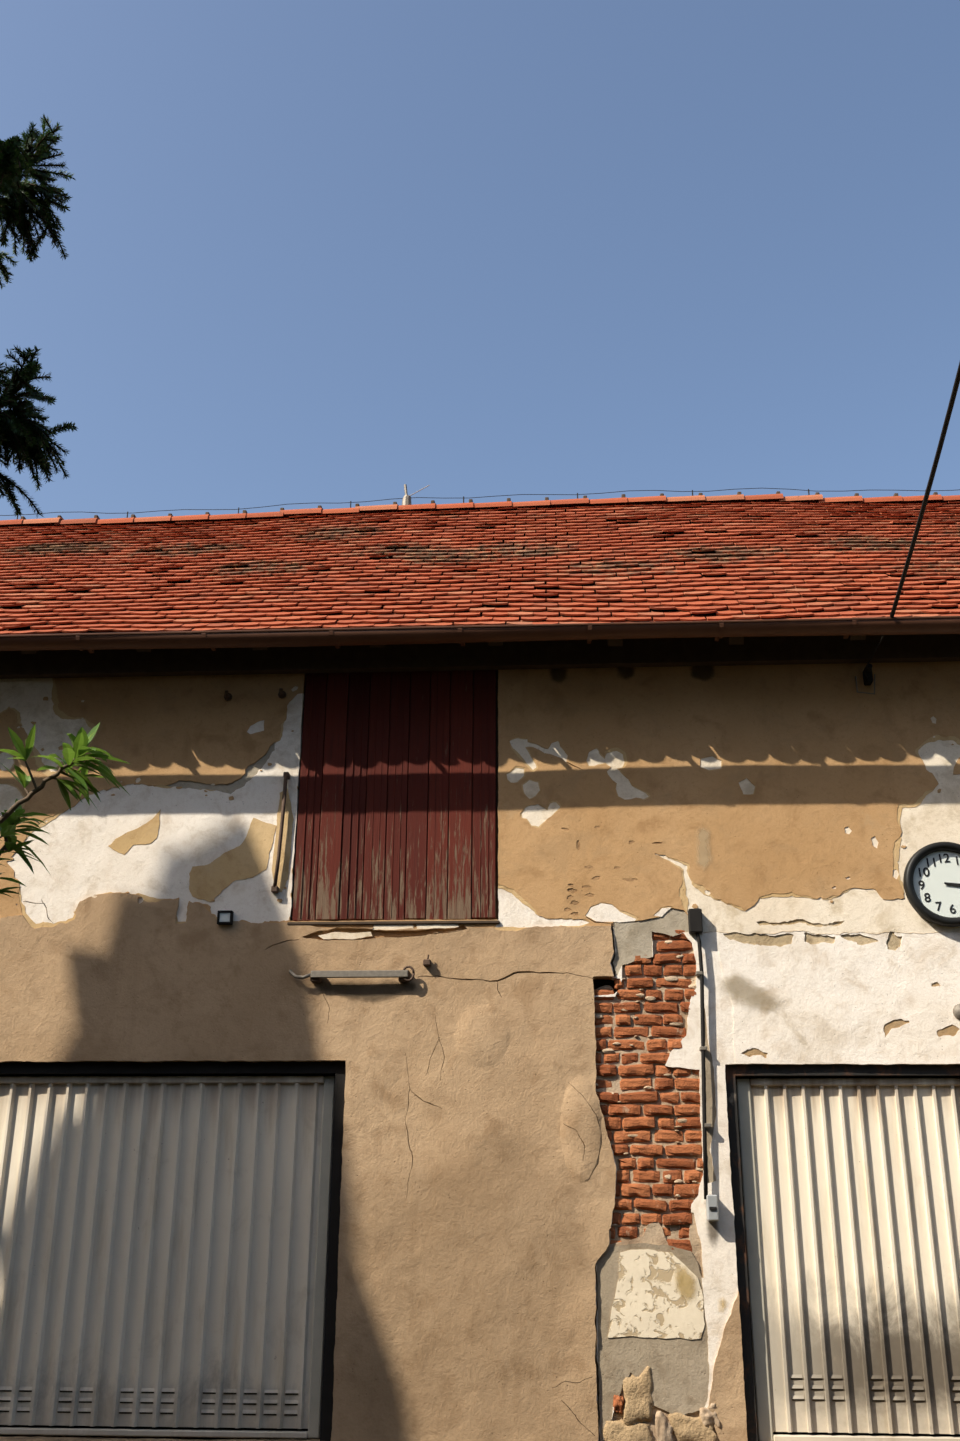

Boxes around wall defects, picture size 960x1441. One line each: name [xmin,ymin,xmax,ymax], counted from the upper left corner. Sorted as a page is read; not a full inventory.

peeling [0,678,304,929]
crack [424,972,541,996]
crack [586,917,616,983]
flaking render [494,716,960,1441]